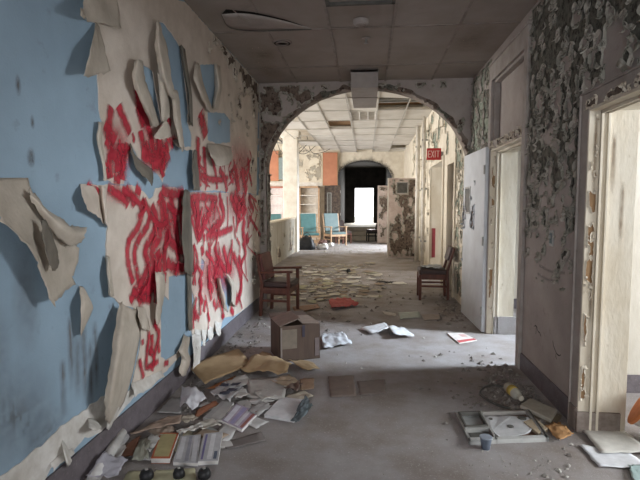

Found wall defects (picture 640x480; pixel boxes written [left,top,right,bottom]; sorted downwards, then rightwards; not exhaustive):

peeling [0,0,351,480]
peeling [378,0,640,300]
peeling [579,356,590,401]